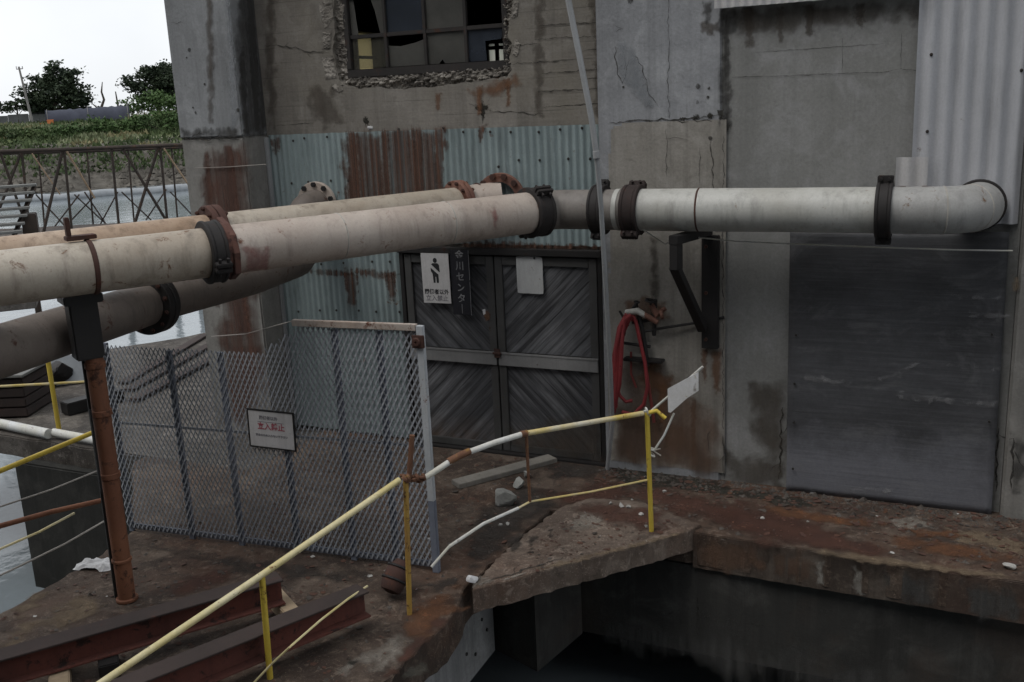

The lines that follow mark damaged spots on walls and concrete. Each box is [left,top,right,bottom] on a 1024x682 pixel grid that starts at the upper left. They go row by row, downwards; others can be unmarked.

spalling [319,0,521,93]
rust [473,76,516,141]
crack [510,0,725,188]
water stain [701,3,878,129]
rust [204,146,248,212]
rust [342,126,446,199]
rust [219,294,263,424]
rust [620,364,717,468]
crack [995,428,1022,490]
rust [560,483,881,556]